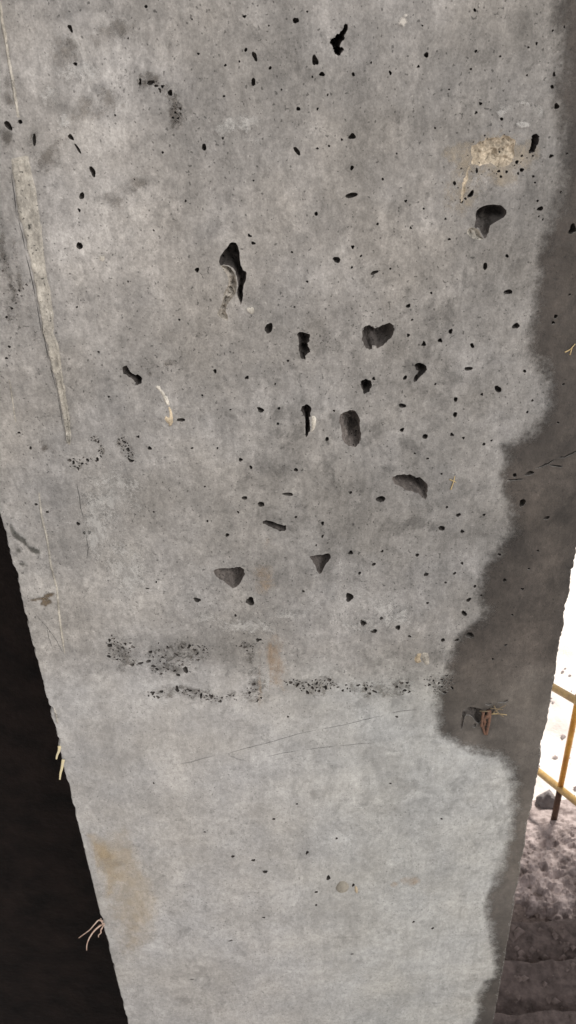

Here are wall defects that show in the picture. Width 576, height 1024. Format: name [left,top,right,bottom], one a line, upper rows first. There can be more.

peeling [445,131,536,240]
leakage [438,0,576,1024]